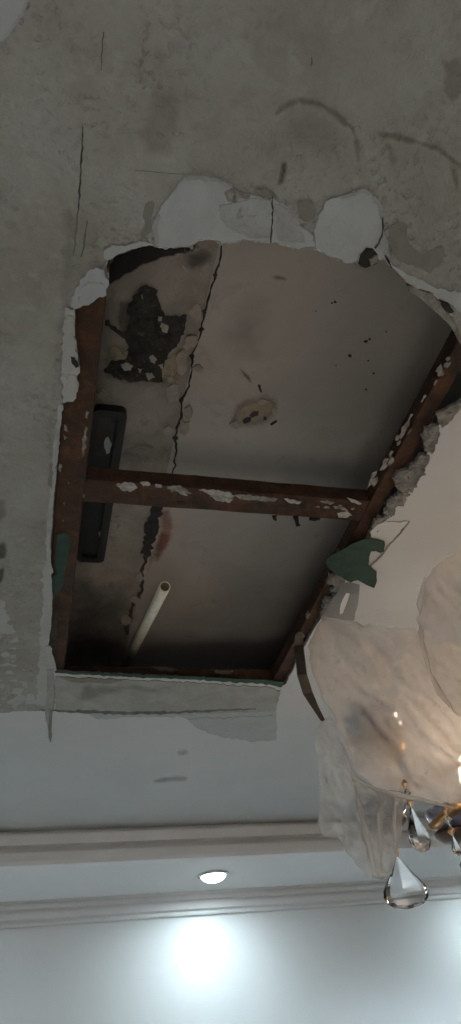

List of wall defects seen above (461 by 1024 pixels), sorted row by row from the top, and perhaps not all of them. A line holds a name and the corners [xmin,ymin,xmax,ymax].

crack [73,127,88,257]
crack [268,196,276,243]
crack [163,246,222,474]
peeling [0,174,461,742]
crack [121,506,163,635]